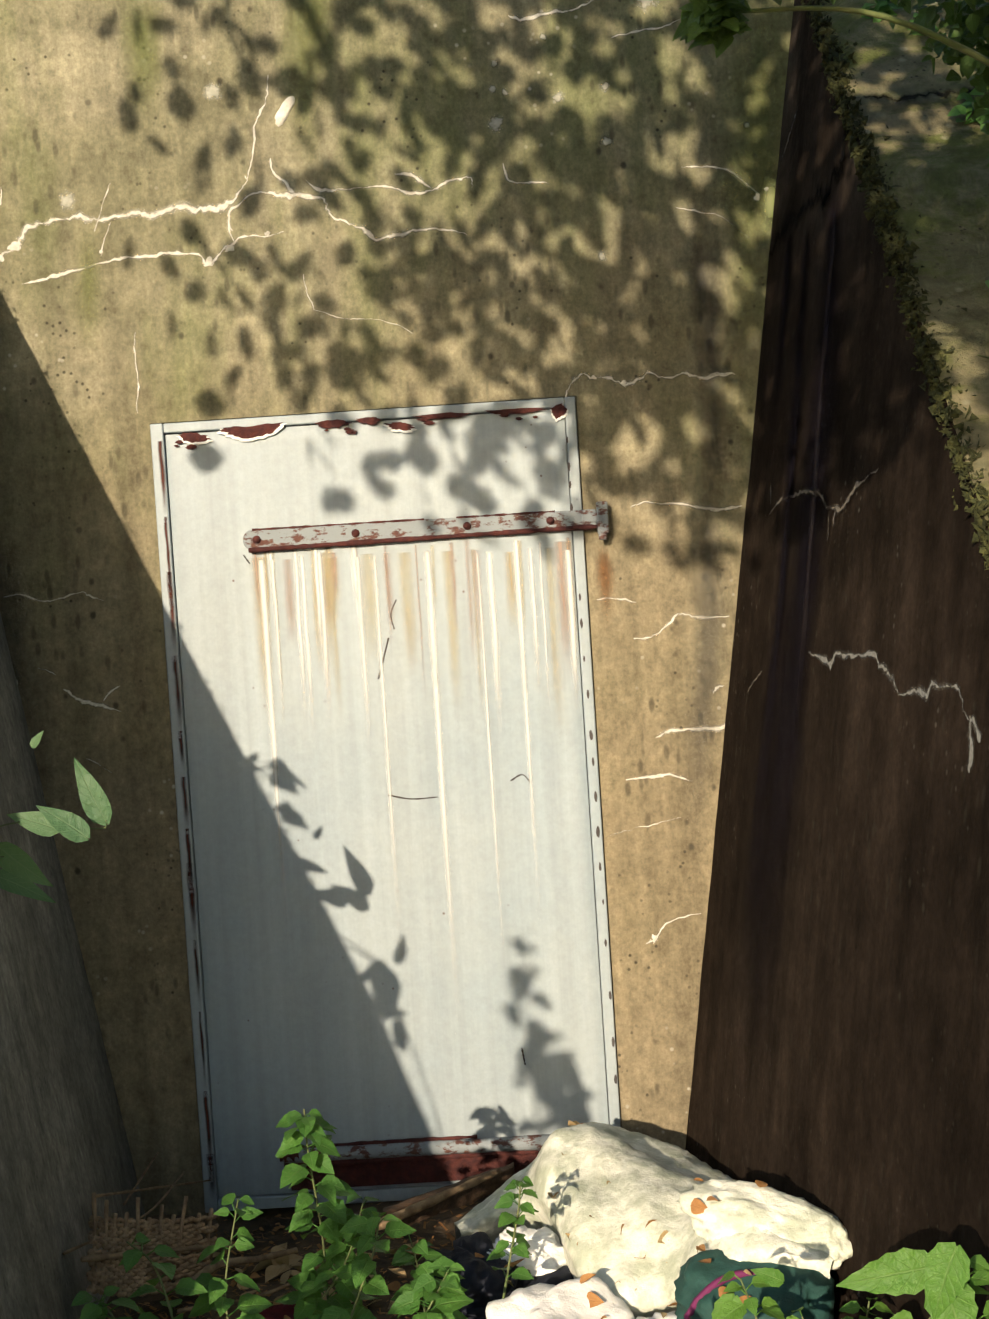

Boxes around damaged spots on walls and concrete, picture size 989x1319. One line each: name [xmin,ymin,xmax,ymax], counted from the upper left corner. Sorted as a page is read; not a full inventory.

crack [0,76,473,284]
crack [503,163,547,184]
crack [303,274,410,332]
crack [565,372,735,397]
crack [631,469,878,540]
corrosion [558,540,569,613]
crack [634,613,729,640]
crack [808,651,981,773]
corrosion [280,1144,316,1168]
corrosion [331,1134,540,1166]